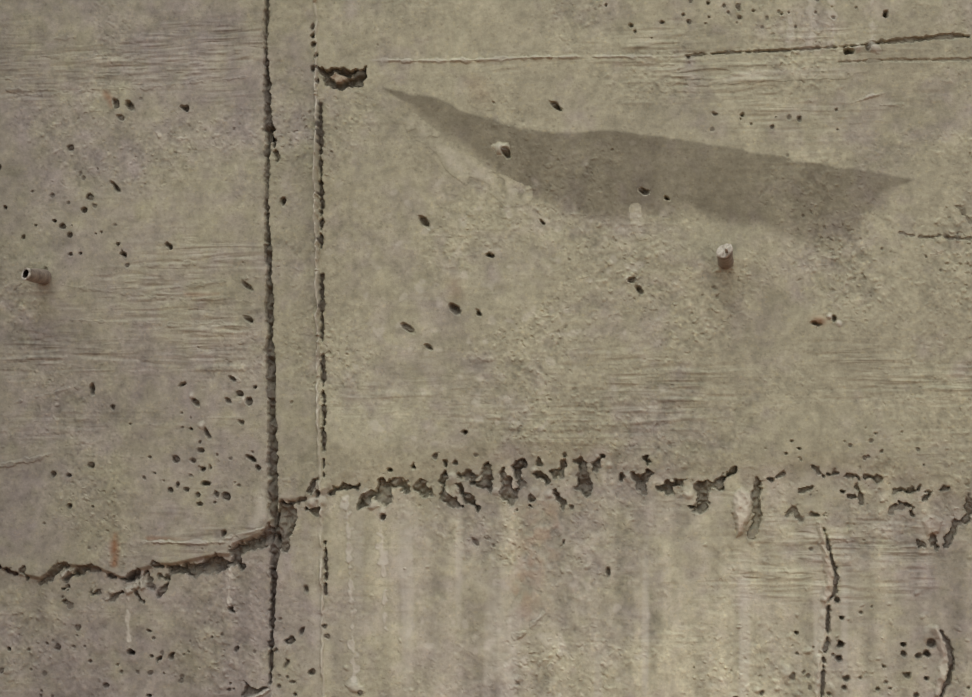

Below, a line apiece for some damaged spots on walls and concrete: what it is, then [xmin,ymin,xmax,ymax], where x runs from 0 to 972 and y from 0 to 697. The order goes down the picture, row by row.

spalling [312,64,367,341]
spalling [223,375,253,407]
spalling [167,427,231,507]
spalling [17,450,786,610]
spalling [784,463,972,552]
crack [0,565,19,577]
spalling [283,626,306,646]
spalling [282,659,298,697]